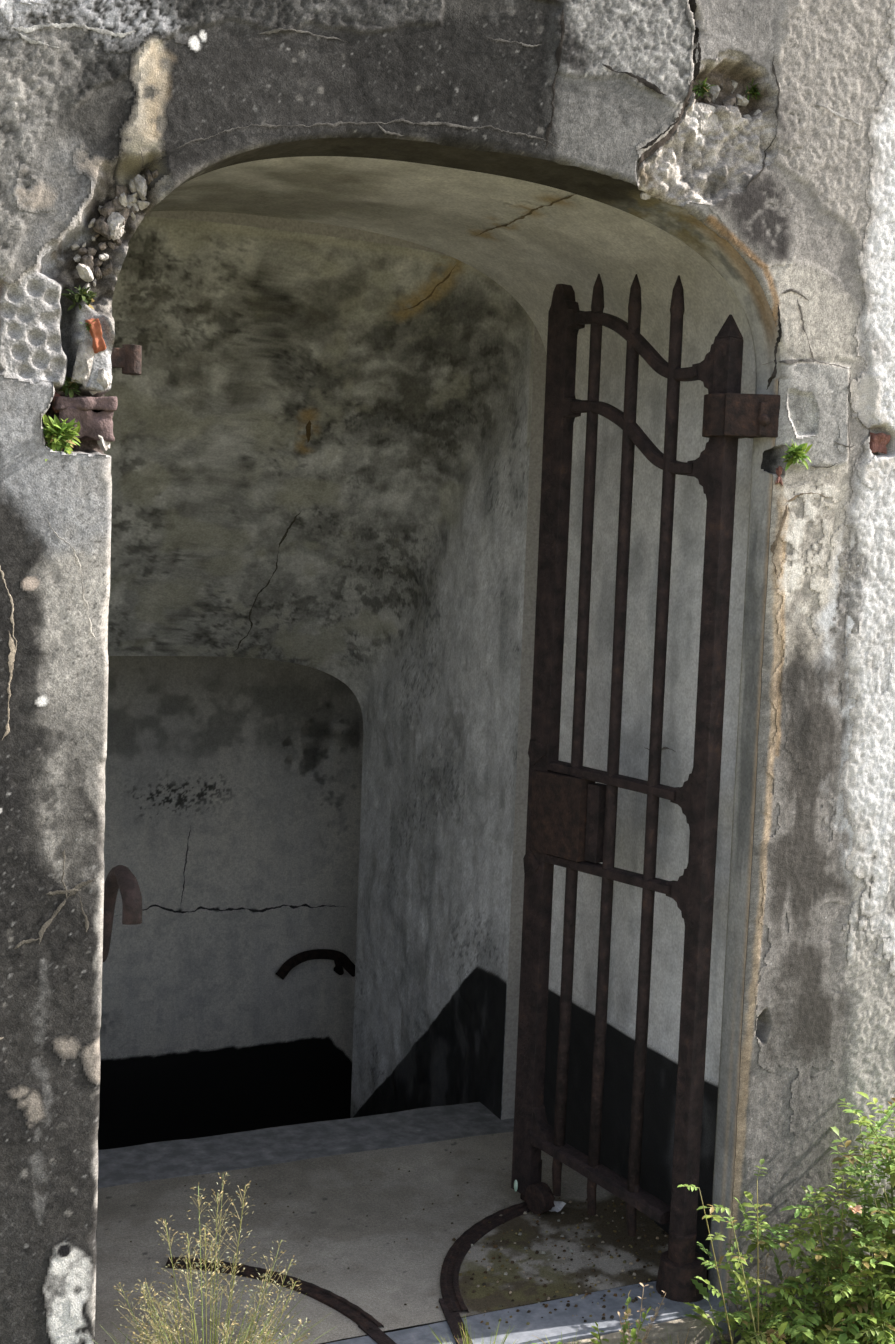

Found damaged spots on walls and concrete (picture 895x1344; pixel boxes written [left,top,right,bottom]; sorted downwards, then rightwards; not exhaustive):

crack [602,0,707,177]
spalling [636,48,779,207]
crack [745,51,780,188]
spalling [0,151,174,458]
damp [112,257,379,359]
damp [361,342,502,504]
crack [230,512,301,656]
damp [753,0,895,1138]
peeling [42,1239,95,1344]